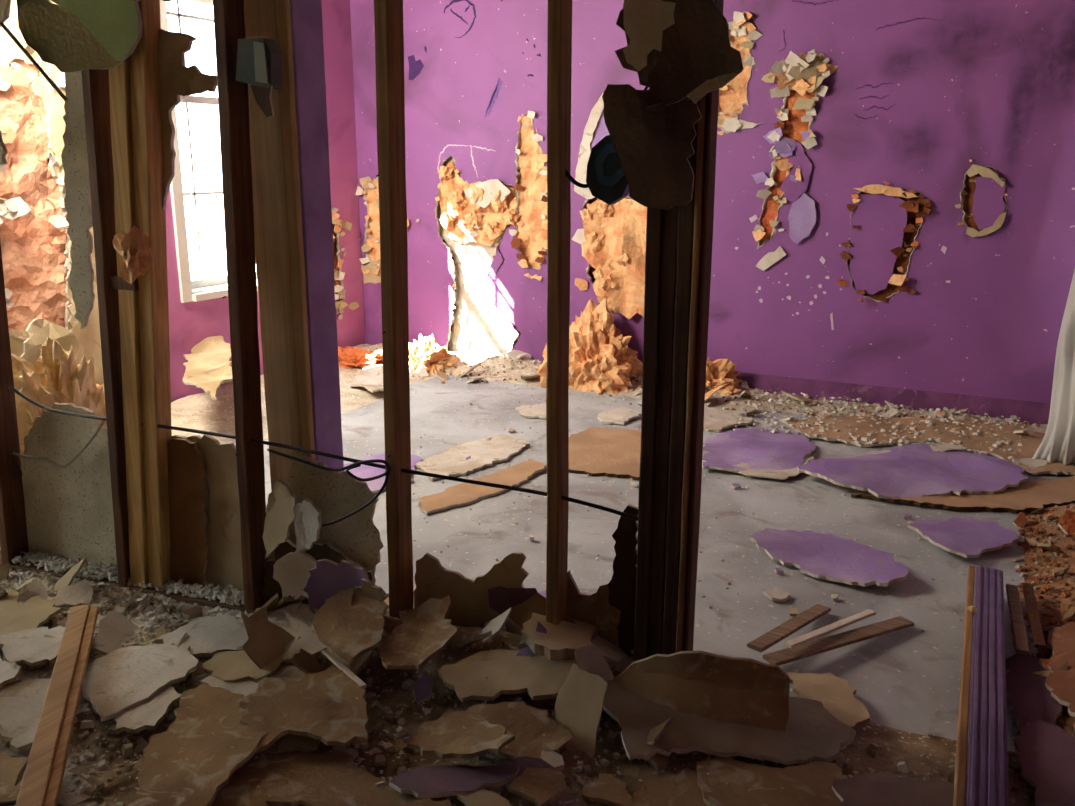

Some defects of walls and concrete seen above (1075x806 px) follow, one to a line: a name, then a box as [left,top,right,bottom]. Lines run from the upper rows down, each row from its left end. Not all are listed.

spalling [0,45,72,342]
spalling [332,176,381,320]
spalling [435,111,547,357]
spalling [571,196,647,319]
spalling [717,11,932,316]
spalling [954,160,1008,237]